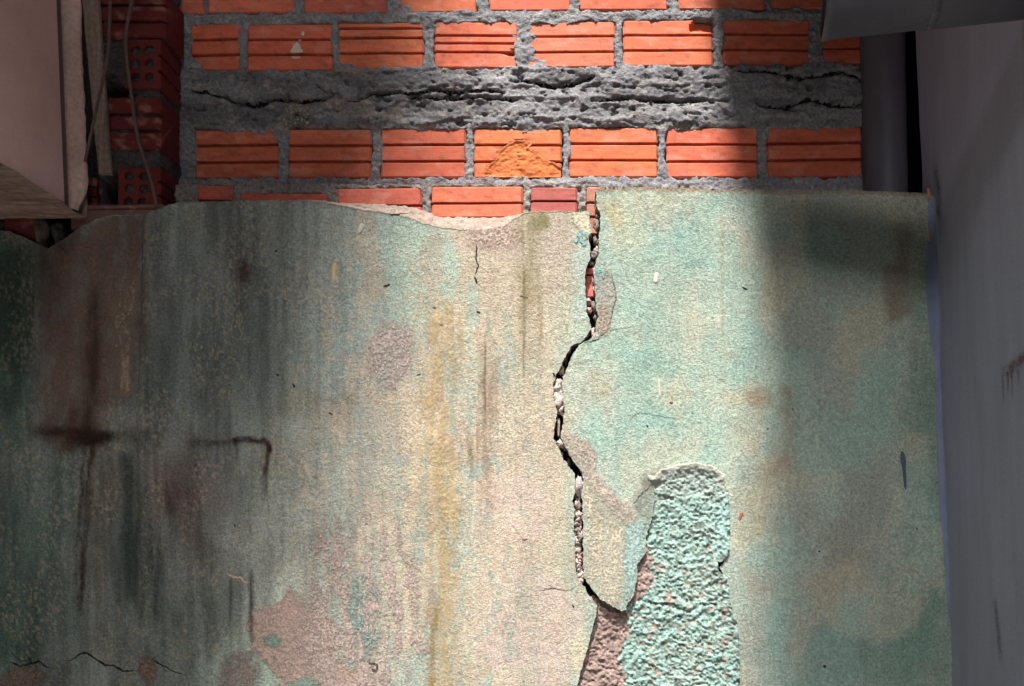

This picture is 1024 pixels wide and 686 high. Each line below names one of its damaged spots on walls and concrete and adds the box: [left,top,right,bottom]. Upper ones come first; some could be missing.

crack [354,76,714,104]
crack [738,70,861,110]
spalling [484,139,561,178]
peeling [590,267,616,341]
crack [544,215,631,596]
spalling [562,432,740,686]
peeling [217,513,435,686]
crack [10,651,182,674]